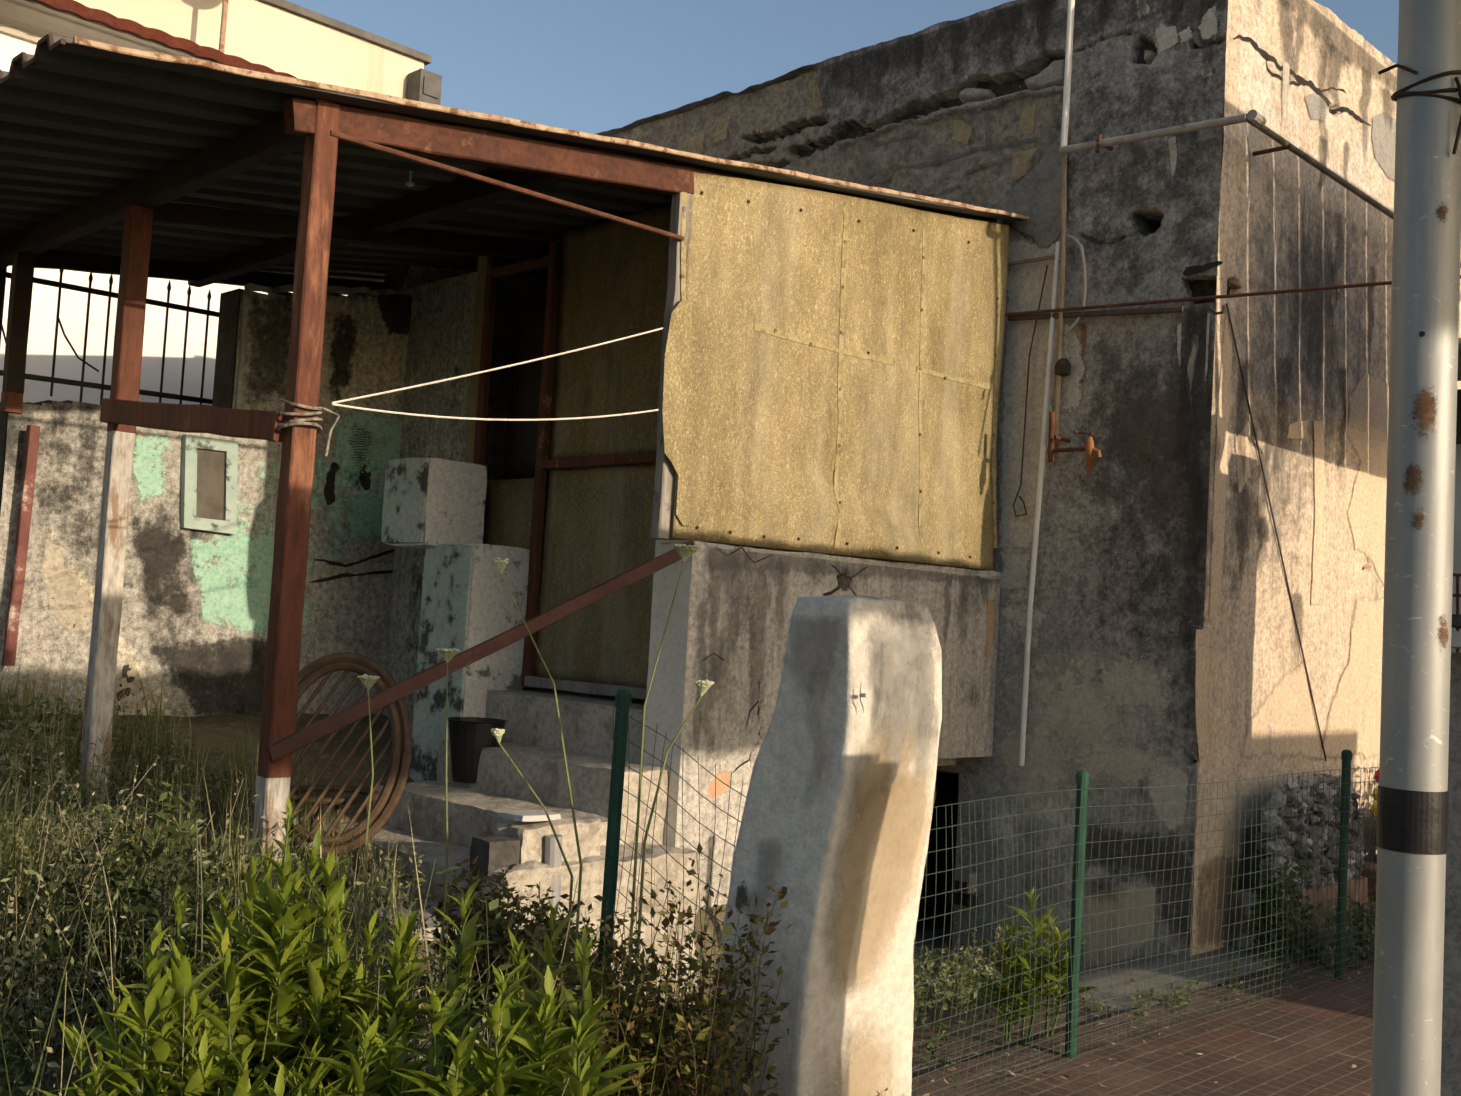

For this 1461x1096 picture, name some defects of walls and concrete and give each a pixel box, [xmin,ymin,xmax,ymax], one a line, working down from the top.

flaking render [1136,0,1218,78]
crack [1194,34,1371,126]
flaking render [609,71,1063,209]
leakage [329,314,358,404]
leakage [377,294,412,335]
corrosion [1410,389,1437,439]
corrosion [1403,463,1424,529]
leakage [133,517,187,616]
leakage [151,636,267,716]
crack [733,681,761,773]
leakage [834,627,938,987]
leakage [843,1035,893,1096]